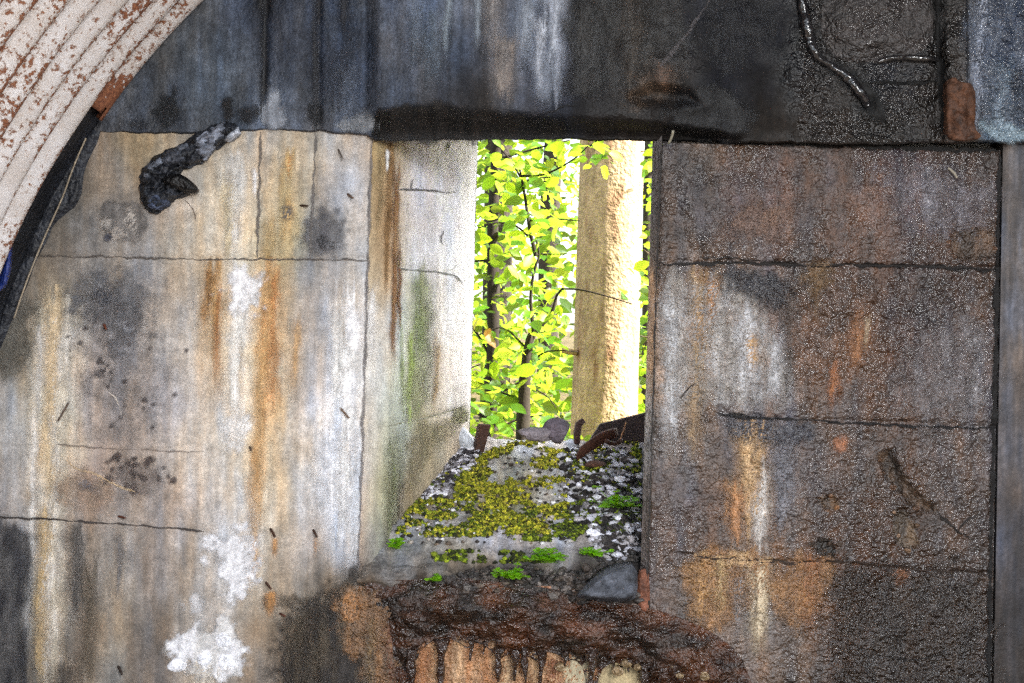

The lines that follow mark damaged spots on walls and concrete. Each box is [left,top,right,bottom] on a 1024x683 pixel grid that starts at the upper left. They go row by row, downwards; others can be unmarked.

rust [202,258,221,358]
rust [257,250,278,424]
rust [279,152,295,236]
rust [377,141,402,351]
water stain [401,304,440,419]
crack [646,0,1002,683]
rust [943,78,981,141]
water stain [0,271,149,683]
water stain [200,522,262,605]
rust [683,419,835,643]